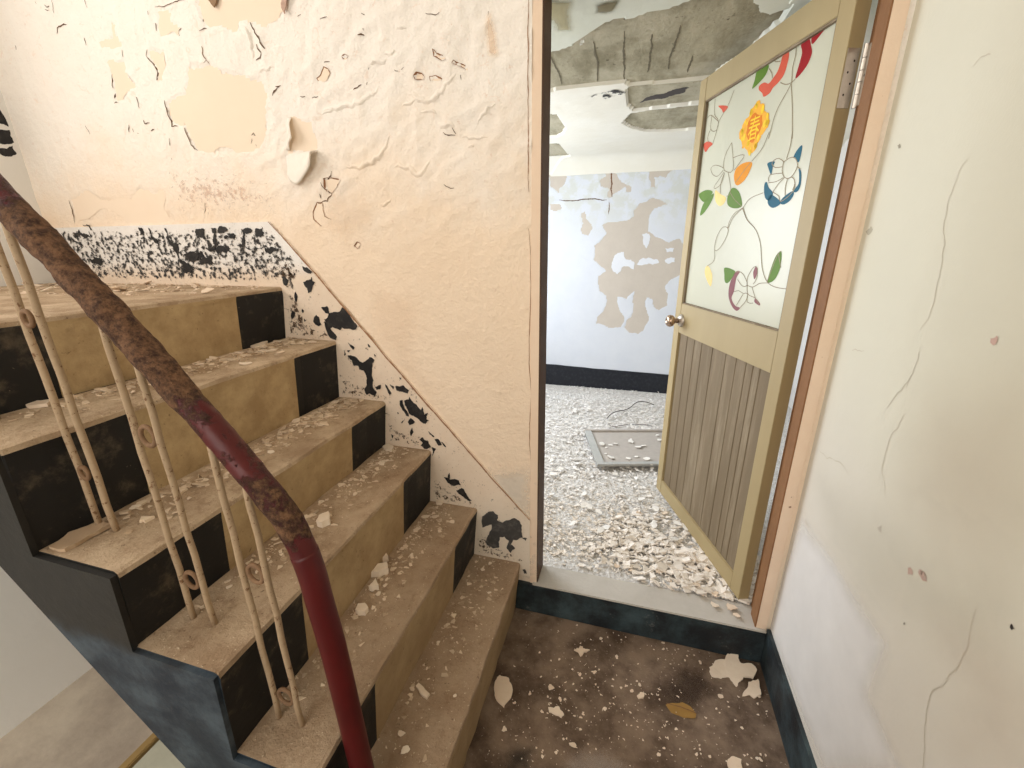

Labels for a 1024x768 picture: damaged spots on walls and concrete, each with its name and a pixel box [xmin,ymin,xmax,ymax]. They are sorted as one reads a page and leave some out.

peeling [198,0,287,32]
peeling [99,23,136,101]
peeling [169,65,267,154]
spalling [285,116,318,184]
spalling [316,66,330,82]
spalling [551,0,783,129]
spalling [313,177,340,226]
peeling [581,170,683,334]
peeling [62,224,446,456]
flaking render [49,522,111,552]
peeling [435,473,527,574]
crack [922,609,976,768]